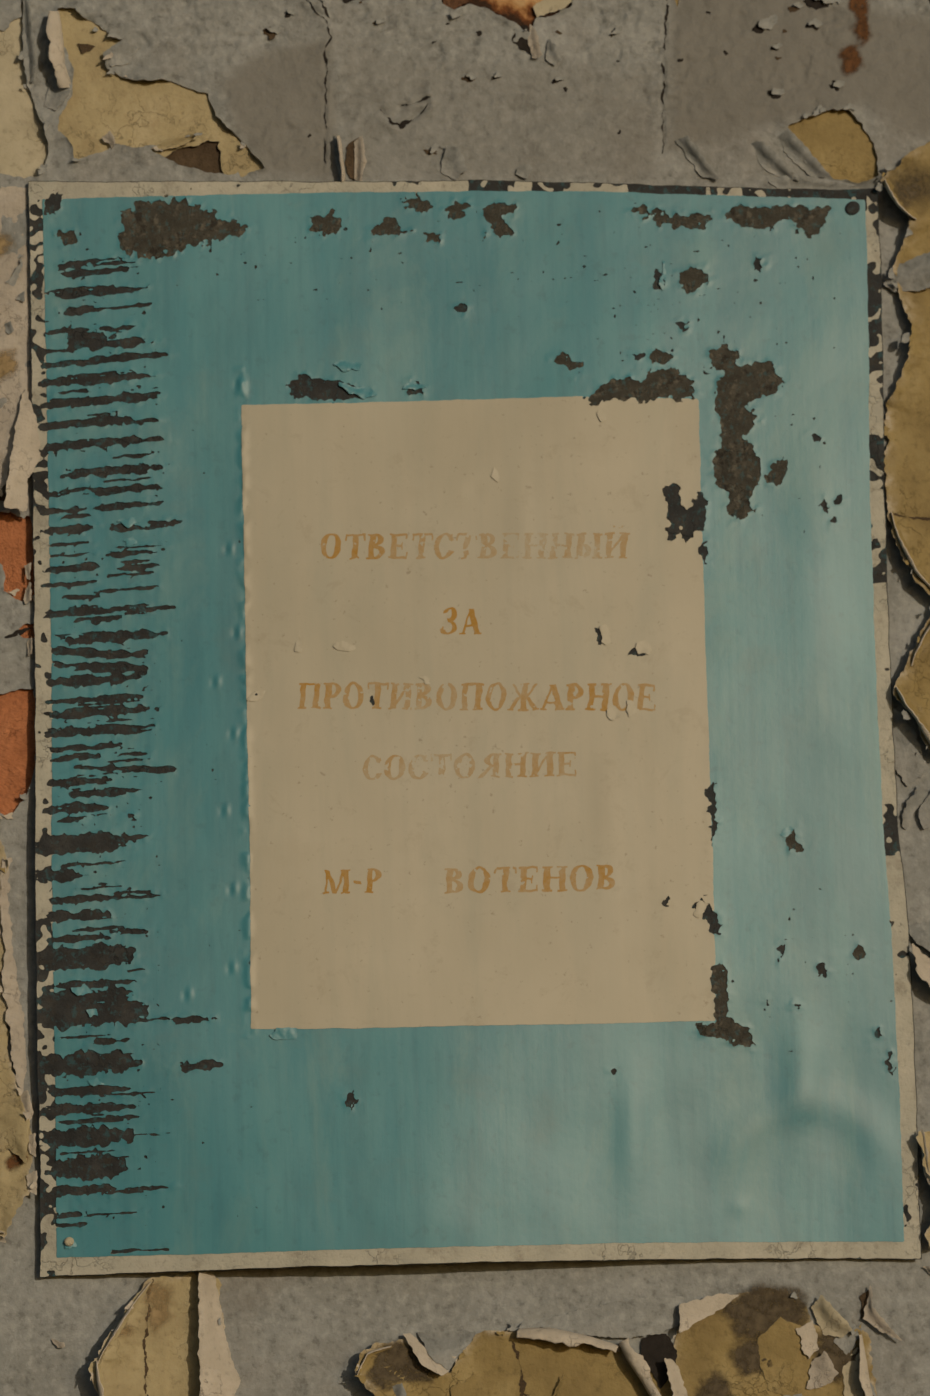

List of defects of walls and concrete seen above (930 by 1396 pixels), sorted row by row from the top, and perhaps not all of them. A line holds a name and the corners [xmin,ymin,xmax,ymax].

spalling [442,0,572,92]
peeling [752,0,841,60]
peeling [676,135,720,180]
peeling [0,0,264,604]
peeling [751,80,930,829]
spalling [4,624,34,656]
spalling [0,689,35,819]
peeling [908,918,930,988]
peeling [0,840,38,1243]
peeling [916,1129,930,1185]
peeling [88,1272,241,1396]
peeling [355,1286,902,1396]